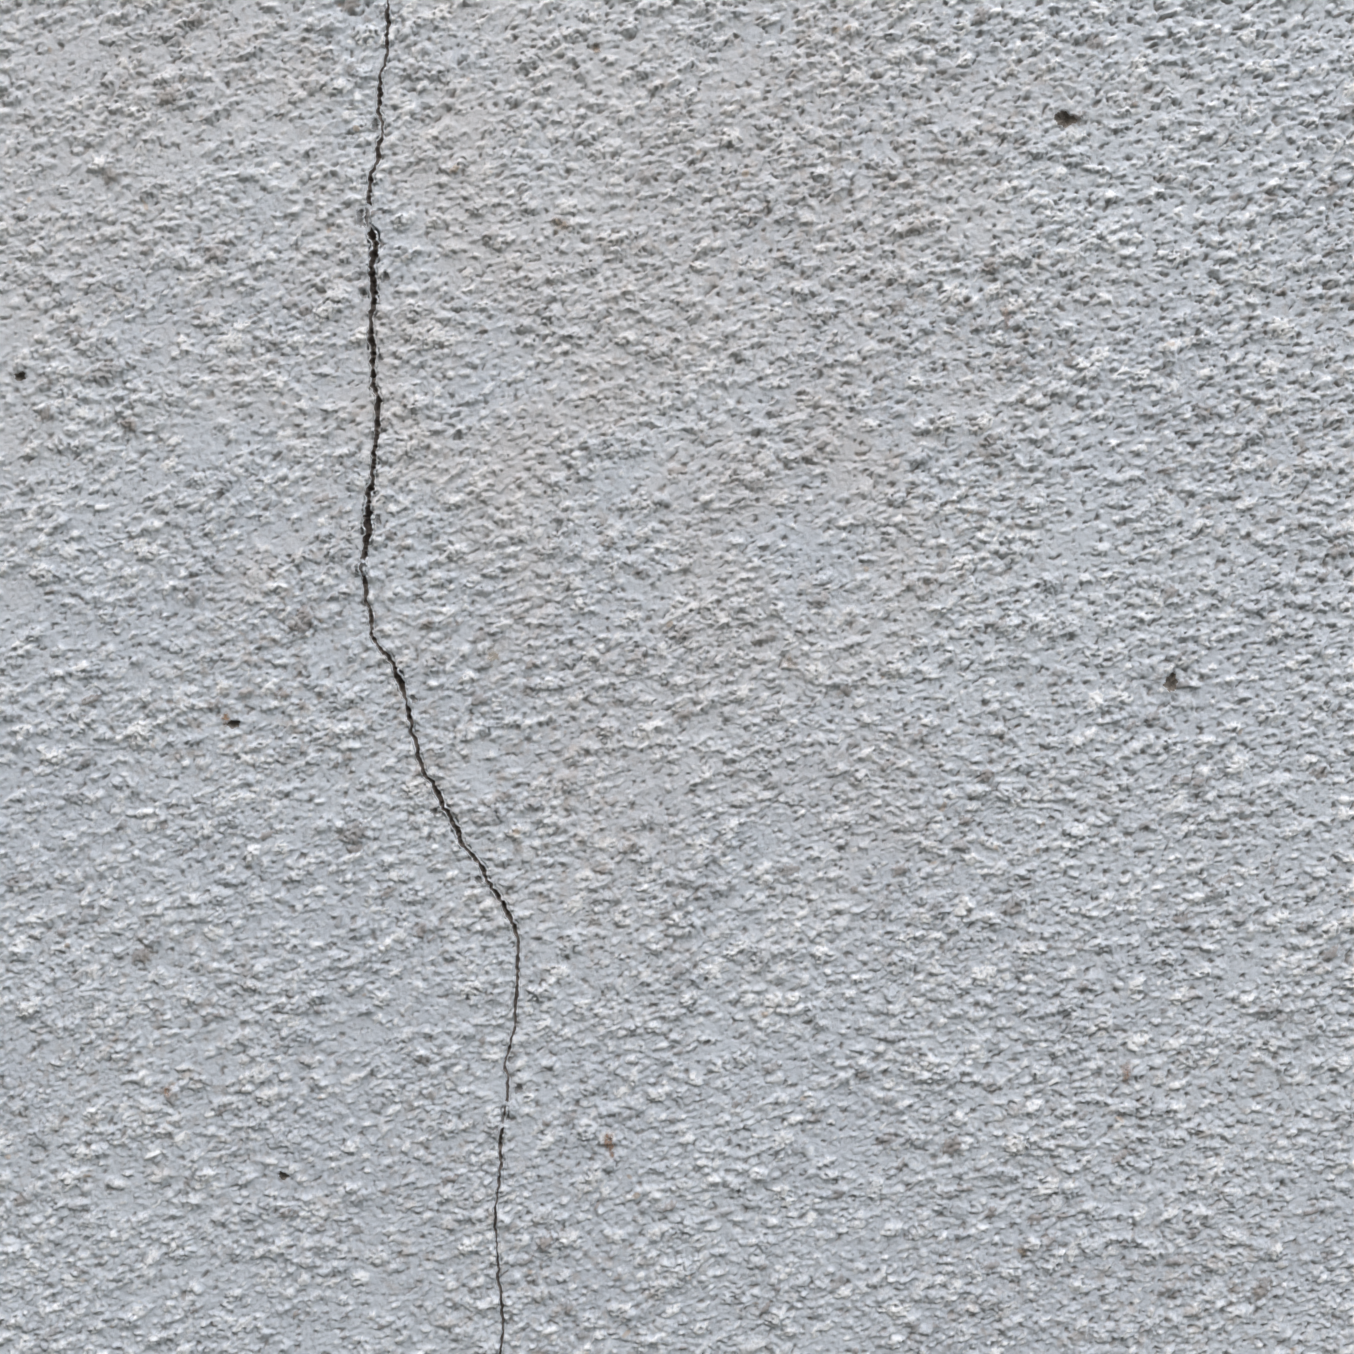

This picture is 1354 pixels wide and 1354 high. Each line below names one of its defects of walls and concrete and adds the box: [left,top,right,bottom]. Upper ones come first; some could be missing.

crack [355,0,523,1354]